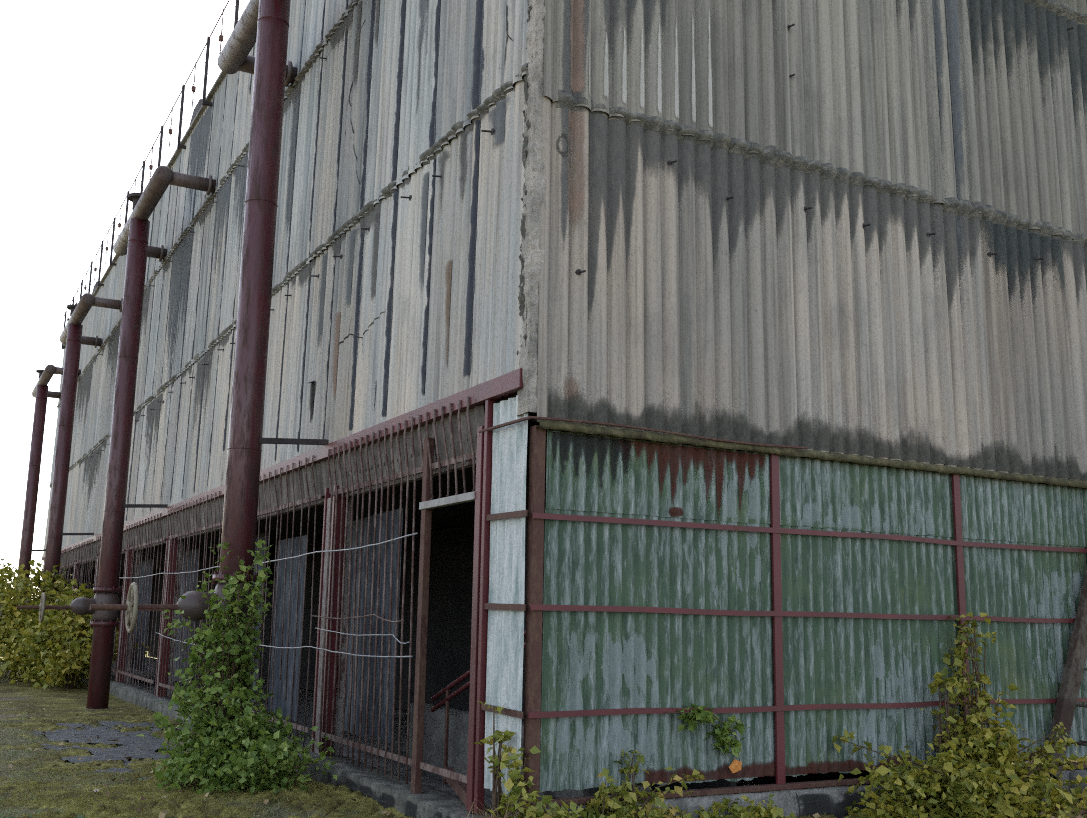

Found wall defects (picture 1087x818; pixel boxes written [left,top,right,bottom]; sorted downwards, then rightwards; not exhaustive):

damp [164,79,252,414]
damp [297,214,380,452]
damp [321,0,371,210]
damp [374,261,395,417]
damp [391,79,402,181]
damp [416,0,466,395]
damp [463,224,477,376]
damp [471,0,507,145]
damp [604,0,679,117]
damp [588,114,1087,316]
damp [933,0,1087,200]
corrosion [620,439,765,517]